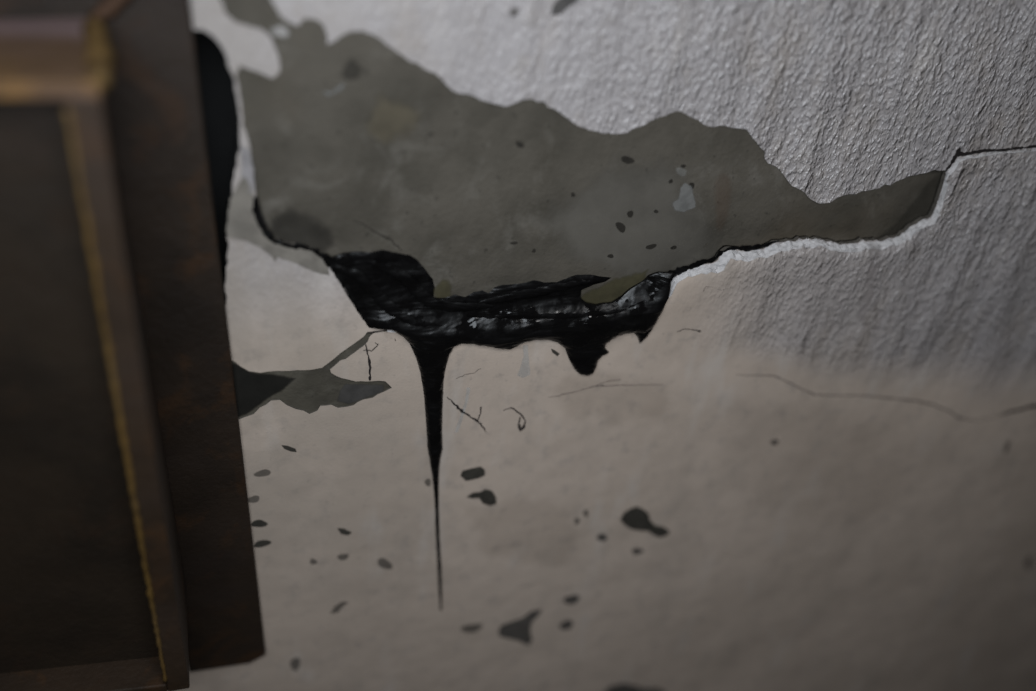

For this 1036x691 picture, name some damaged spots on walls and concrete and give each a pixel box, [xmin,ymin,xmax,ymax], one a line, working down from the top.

spalling [222,0,942,304]
crack [945,145,1036,171]
peeling [232,332,391,418]
water stain [252,196,779,610]